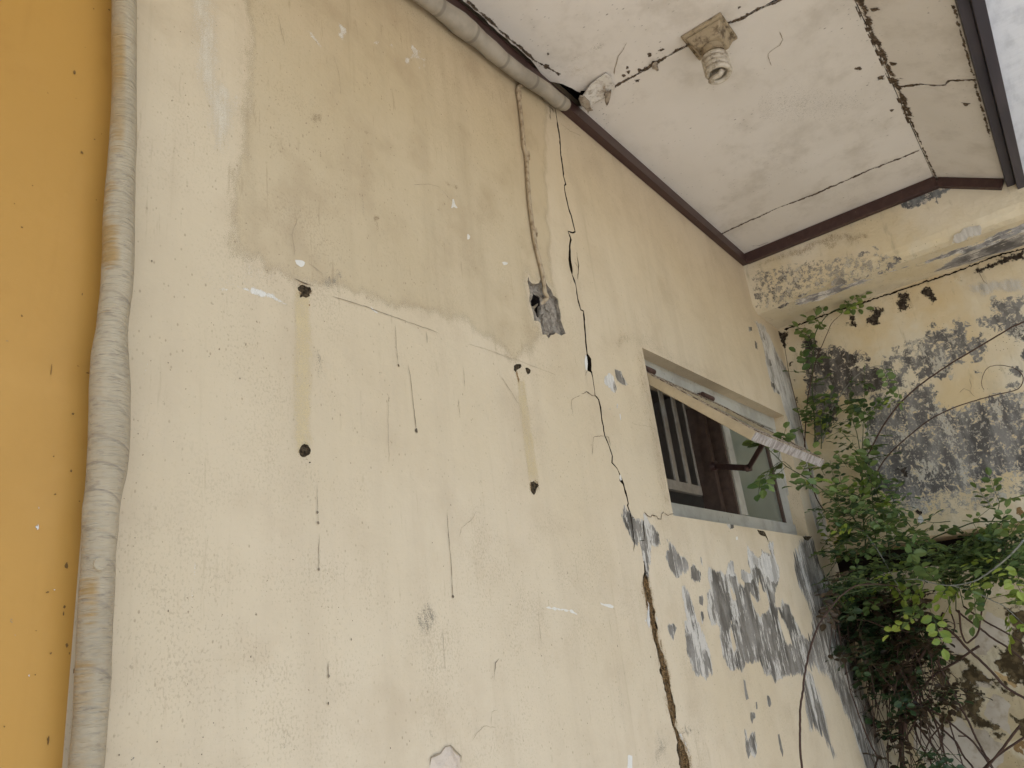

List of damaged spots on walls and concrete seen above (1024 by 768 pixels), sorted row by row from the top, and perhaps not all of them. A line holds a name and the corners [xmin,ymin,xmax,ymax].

spalling [527,278,566,338]
crack [550,108,670,519]
leakage [846,306,884,327]
leakage [896,286,937,312]
leakage [966,249,1024,297]
peeling [604,369,628,420]
peeling [621,295,1024,768]
crack [641,555,693,768]